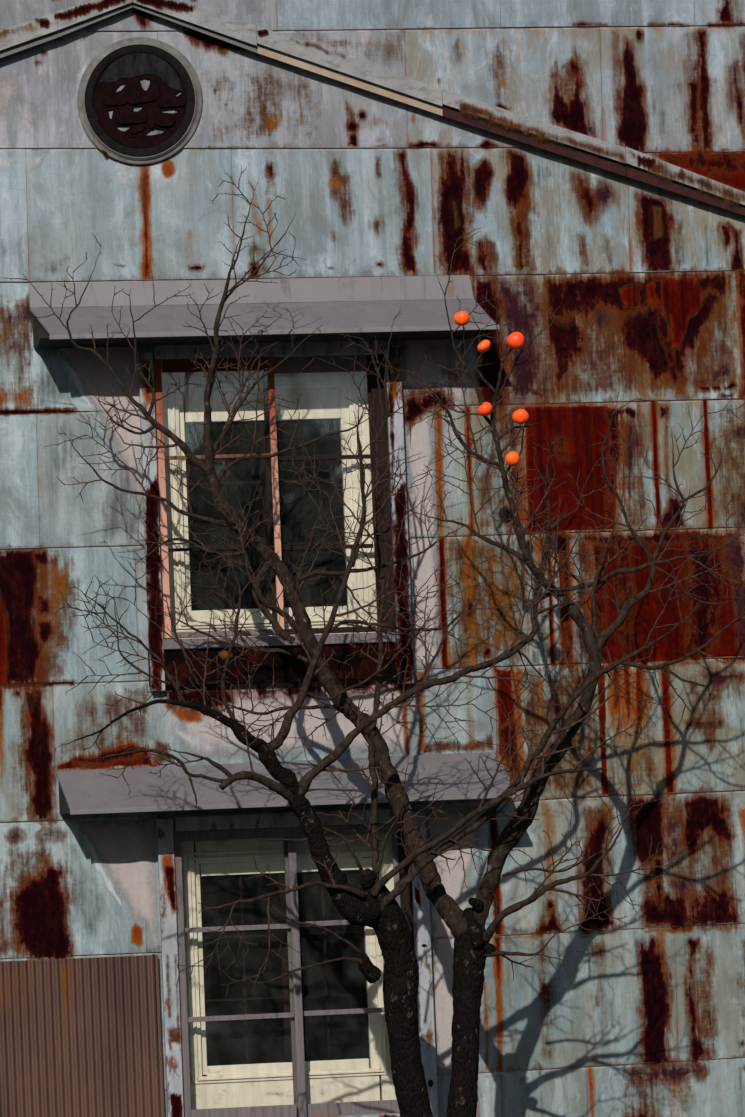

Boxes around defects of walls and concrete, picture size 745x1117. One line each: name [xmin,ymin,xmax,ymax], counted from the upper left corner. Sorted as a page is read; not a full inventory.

corrosion [718,0,741,26]
corrosion [460,29,745,202]
corrosion [139,160,174,279]
corrosion [397,150,417,276]
corrosion [401,149,745,1117]
corrosion [0,546,170,975]